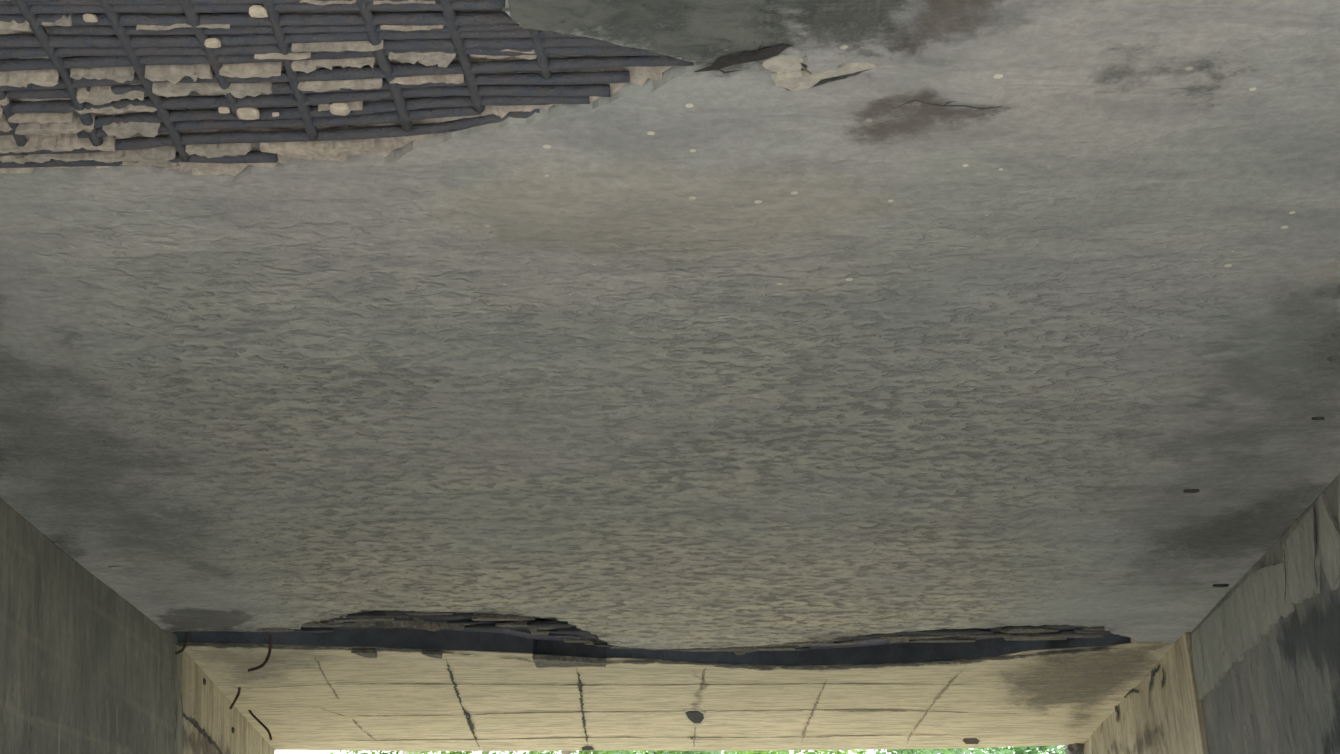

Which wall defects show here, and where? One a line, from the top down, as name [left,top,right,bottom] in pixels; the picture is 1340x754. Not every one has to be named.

spalling [0,0,693,176]
peeling [762,48,877,91]
crack [447,665,493,746]
crack [529,669,588,743]
spalling [162,609,1131,672]
crack [802,675,958,740]
damp [1004,645,1164,726]
damp [1277,593,1340,754]